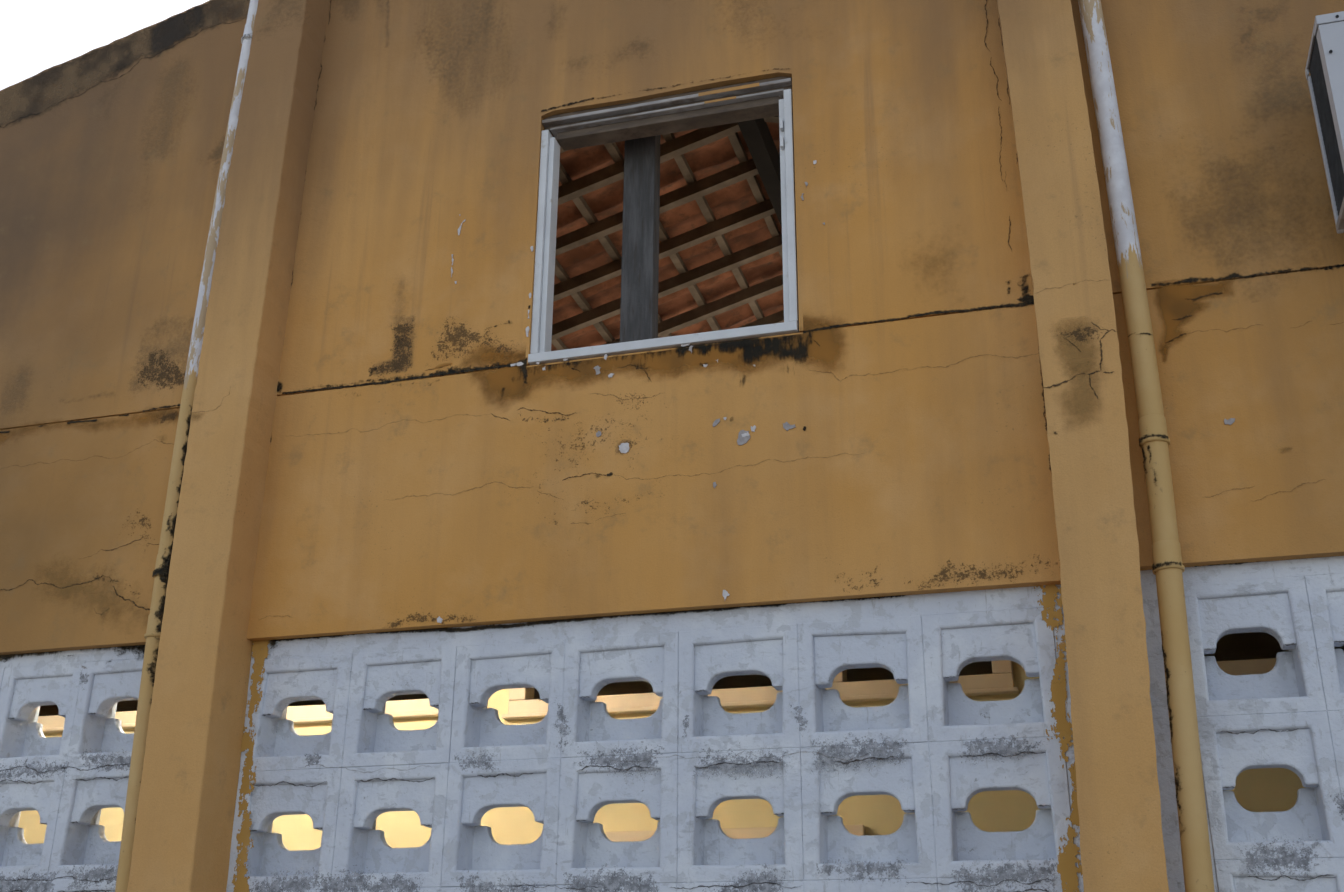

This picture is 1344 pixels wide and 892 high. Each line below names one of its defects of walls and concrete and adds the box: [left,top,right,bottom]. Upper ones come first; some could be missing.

water stain [0,0,250,125]
crack [984,0,1018,181]
water stain [138,348,186,389]
water stain [277,275,1034,401]
peeling [713,417,756,445]
water stain [1060,325,1101,416]
crack [1040,323,1151,470]
crack [1,512,159,610]
water stain [0,404,192,703]